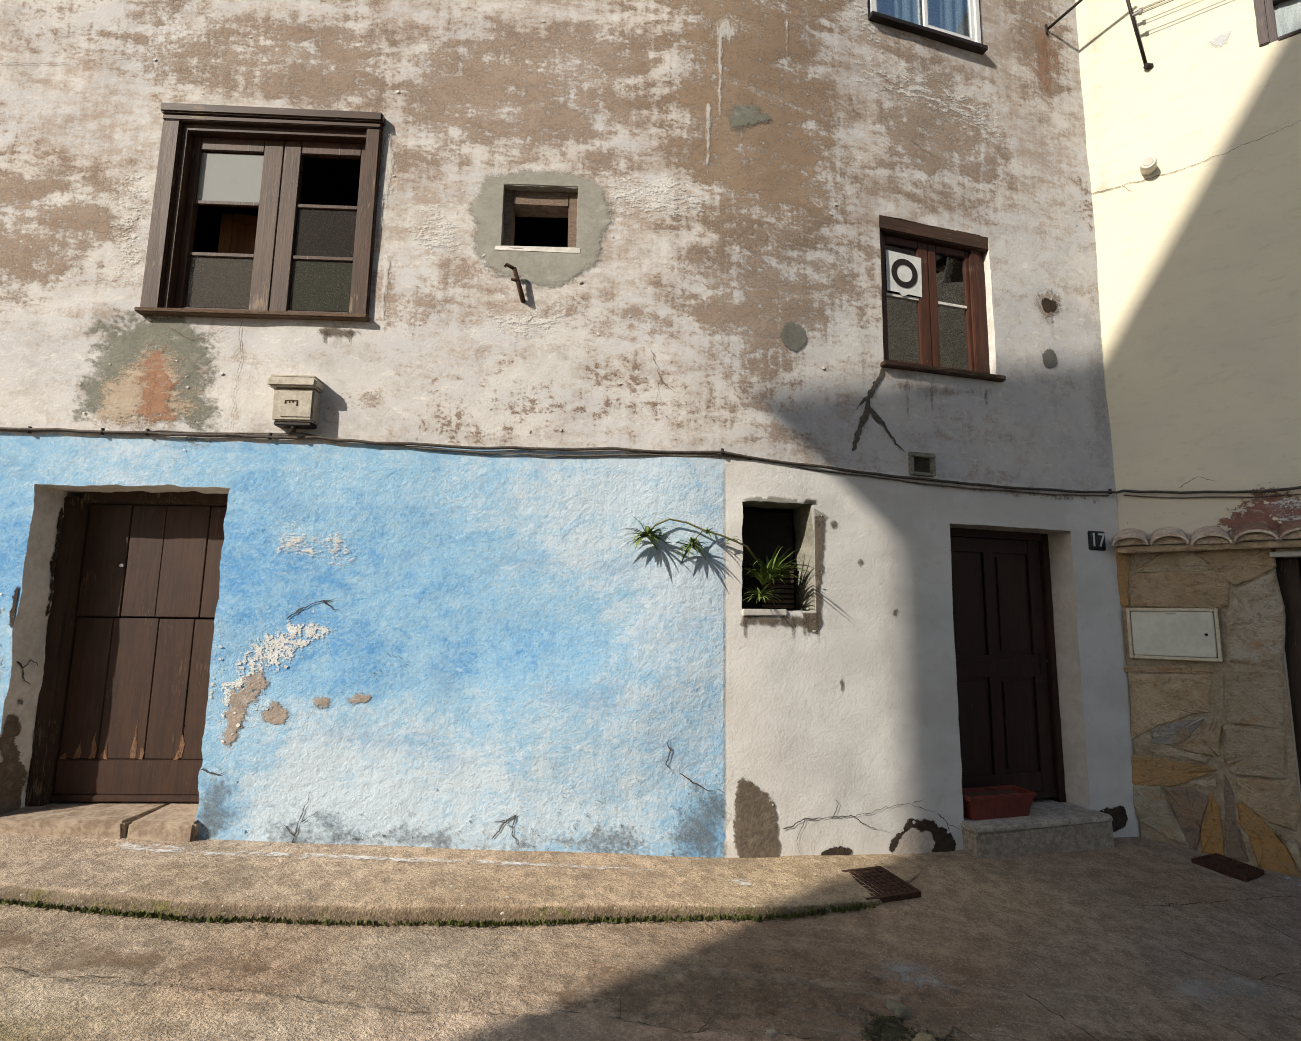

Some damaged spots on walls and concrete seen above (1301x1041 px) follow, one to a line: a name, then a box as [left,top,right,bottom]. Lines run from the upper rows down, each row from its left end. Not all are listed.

crack [1091,120,1300,194]
peeling [0,141,135,303]
peeling [82,0,1013,443]
crack [852,367,905,452]
peeling [1216,482,1301,536]
crack [287,599,338,619]
peeling [0,655,28,815]
crack [665,740,723,792]
spalling [733,778,780,858]
crack [783,800,961,852]
spalling [889,818,956,855]